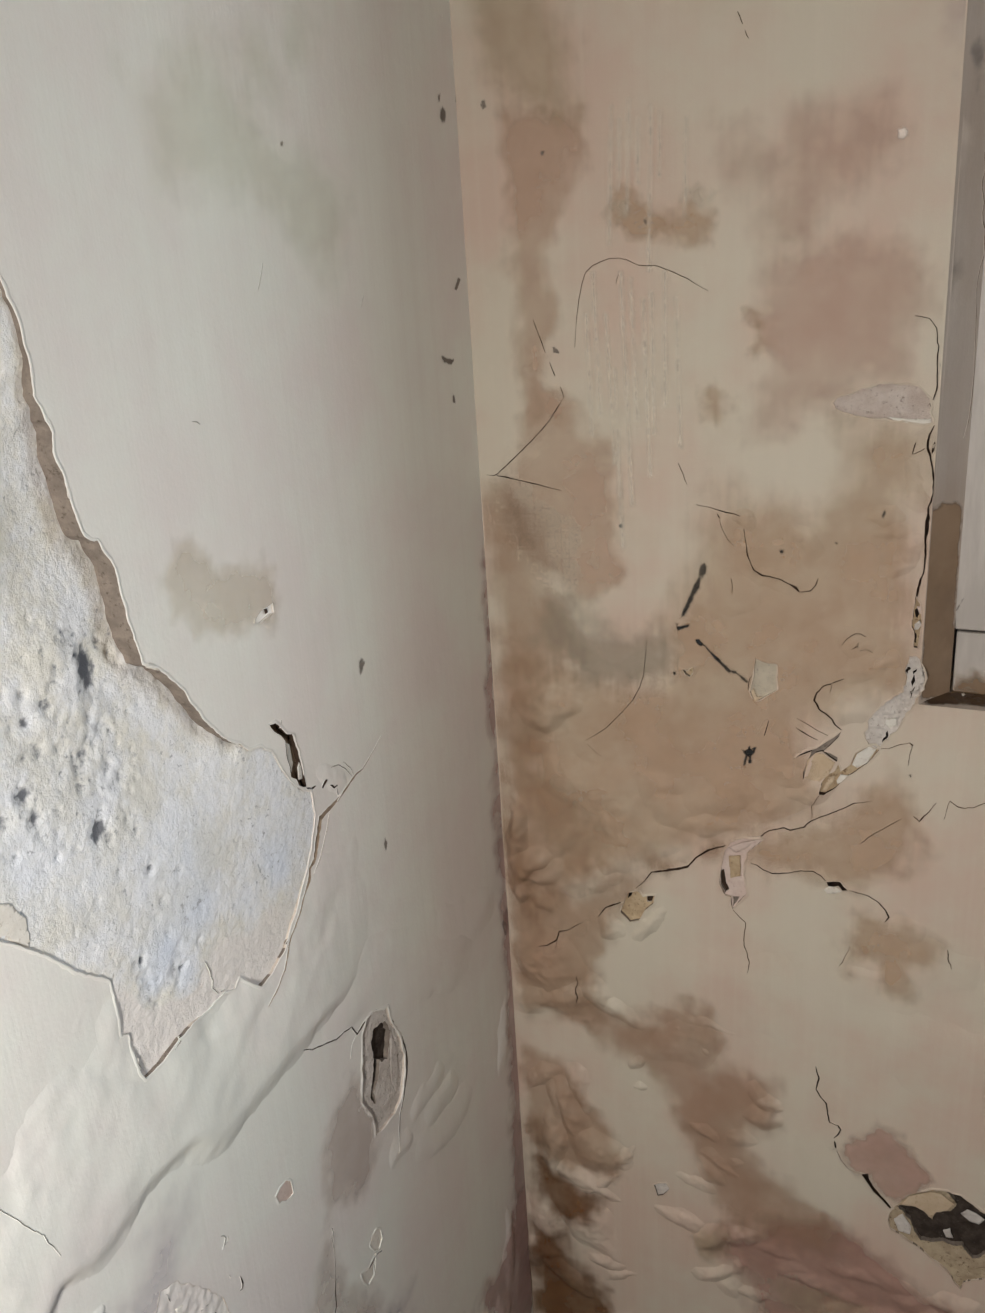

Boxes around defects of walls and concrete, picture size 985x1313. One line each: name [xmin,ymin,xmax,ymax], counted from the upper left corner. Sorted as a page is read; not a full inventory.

spalling [0,275,316,1082]
crack [585,639,647,756]
leakage [677,564,748,682]
leakage [743,746,756,766]
crack [764,633,873,740]
spalling [793,595,928,796]
leakage [922,503,961,698]
crack [733,910,750,973]
crack [539,796,985,948]
spalling [360,1004,406,1139]
leakage [486,1119,532,1313]
spalling [845,1129,985,1292]